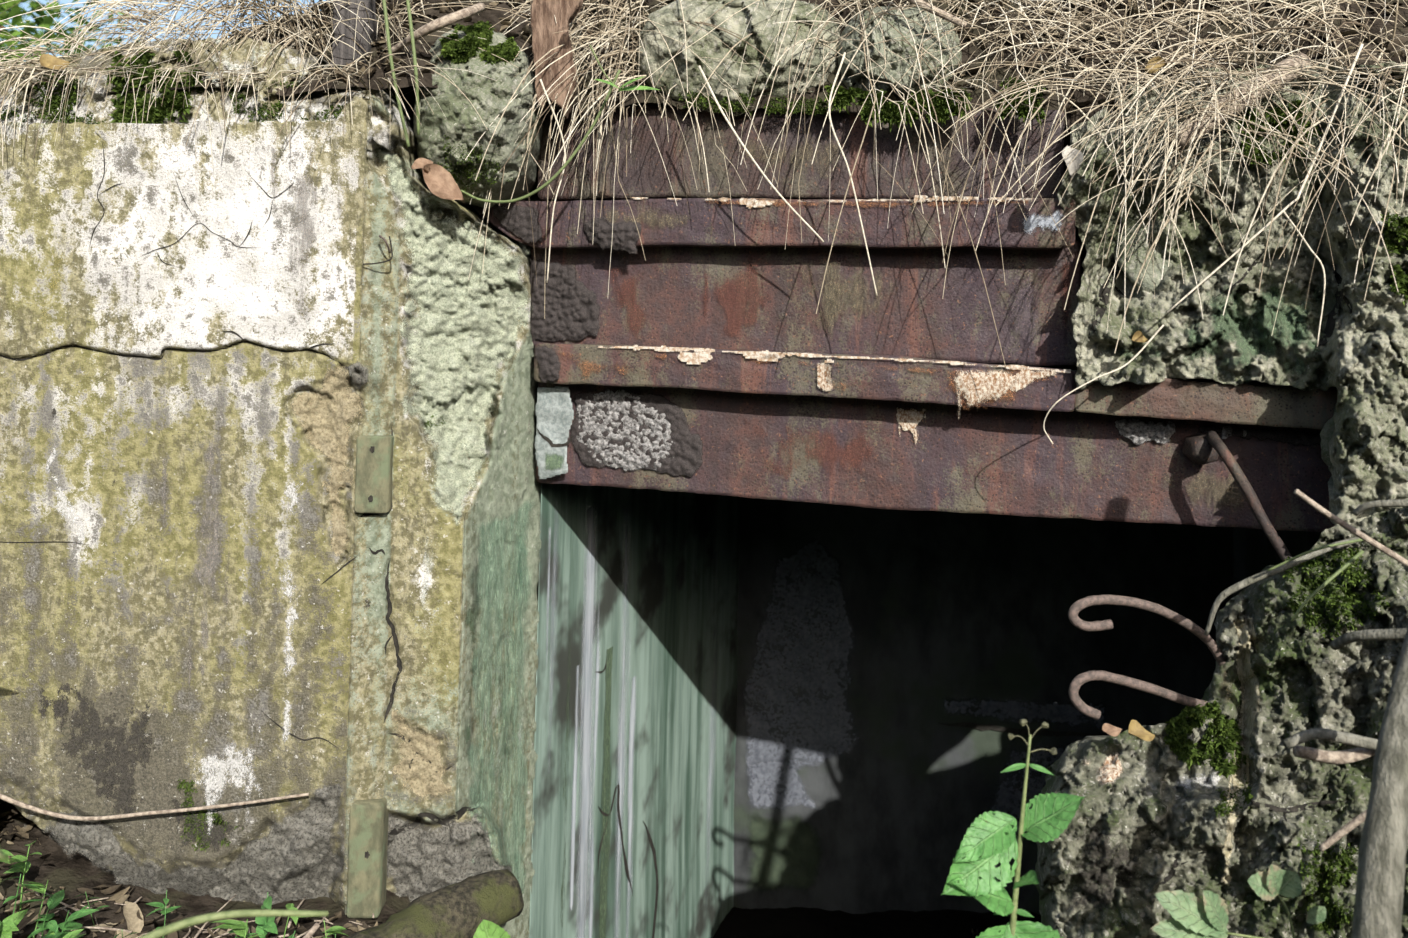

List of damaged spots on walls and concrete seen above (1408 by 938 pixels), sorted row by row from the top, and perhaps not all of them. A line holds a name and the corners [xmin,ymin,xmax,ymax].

crack [138,171,292,267]
rust [705,195,1031,208]
crack [0,330,349,370]
spalling [373,145,530,523]
rust [493,204,1071,406]
rust [1181,421,1321,446]
water stain [280,571,298,676]
crack [321,506,452,773]
water stain [38,678,155,814]
water stain [168,746,260,851]
peeling [991,746,1066,836]
peeling [943,670,1208,729]